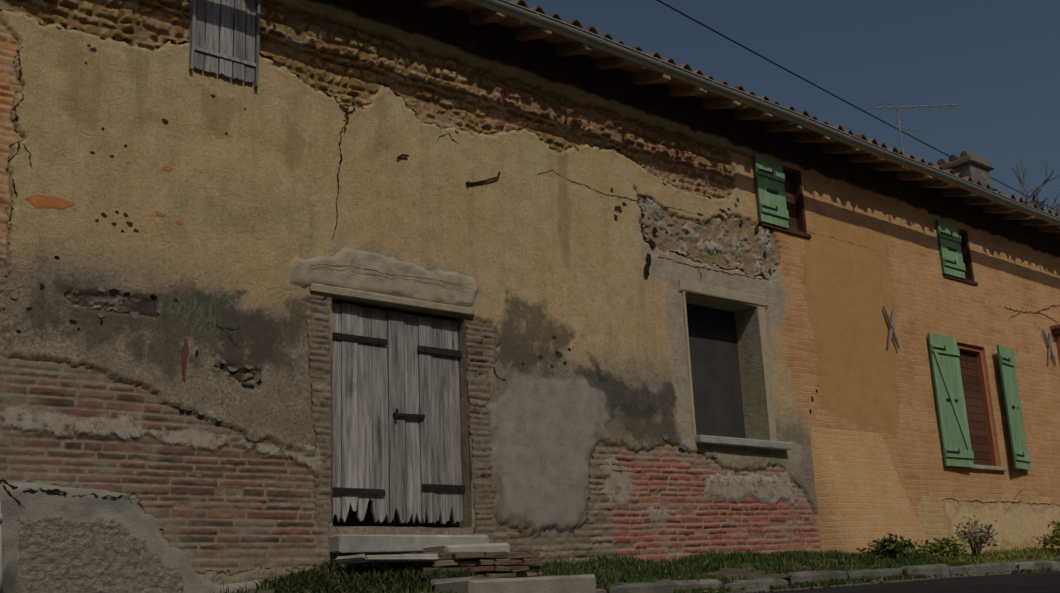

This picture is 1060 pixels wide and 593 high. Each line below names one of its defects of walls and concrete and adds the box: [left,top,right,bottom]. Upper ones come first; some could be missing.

peeling [0,0,191,64]
peeling [0,23,334,593]
crack [311,97,472,289]
peeling [260,0,739,213]
spalling [645,217,668,277]
crack [0,479,137,506]
peeling [465,319,821,565]